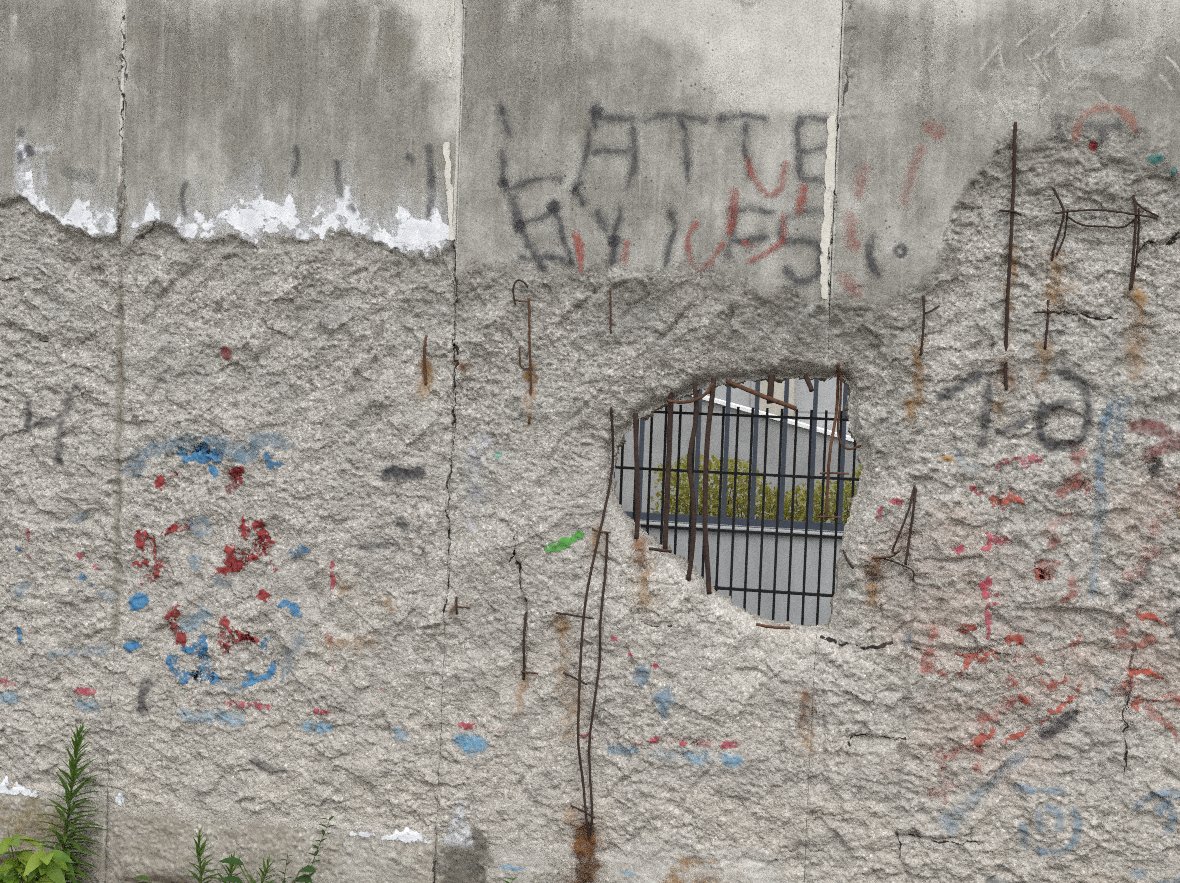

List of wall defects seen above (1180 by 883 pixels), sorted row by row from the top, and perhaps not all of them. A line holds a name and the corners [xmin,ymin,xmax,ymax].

peeling [17,144,28,165]
water stain [0,0,708,271]
rust [512,279,536,396]
water stain [782,176,821,277]
rust [999,122,1021,390]
rust [1051,187,1159,308]
spalling [0,168,456,844]
rust [633,374,797,595]
spalling [436,119,1180,883]
rust [842,485,917,582]
rust [521,613,538,680]
rust [556,407,614,883]